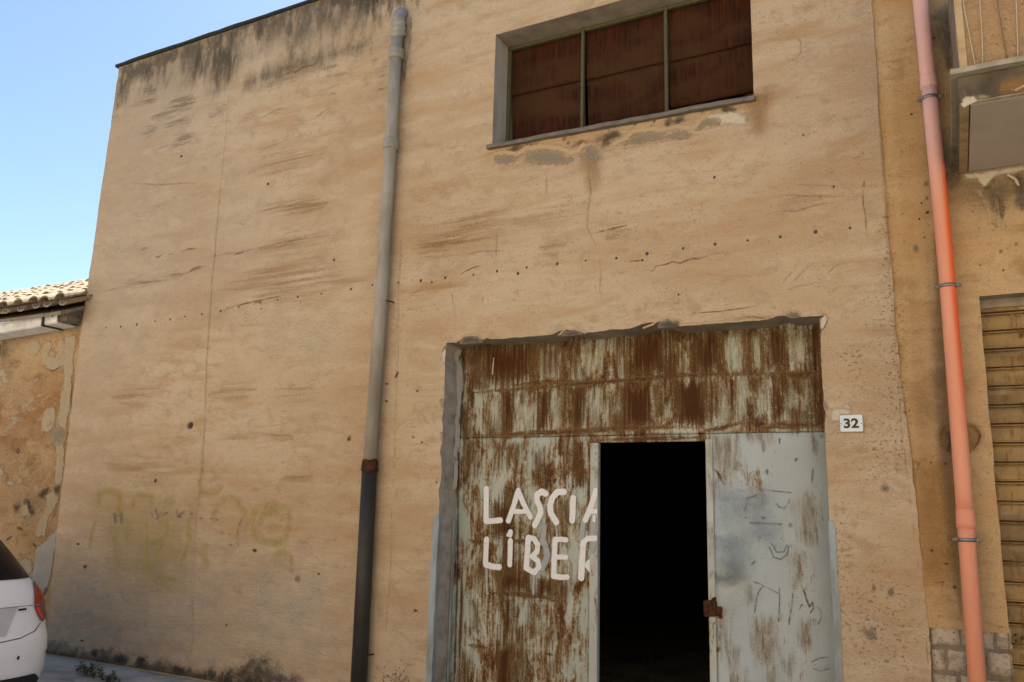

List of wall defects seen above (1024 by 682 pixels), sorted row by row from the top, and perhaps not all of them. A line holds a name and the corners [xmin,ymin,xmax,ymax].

water stain [117,0,403,104]
spalling [612,110,747,146]
spalling [493,137,599,165]
peeling [6,335,76,547]
corrosion [458,324,825,682]
peeling [18,558,32,578]
water stain [46,641,296,682]